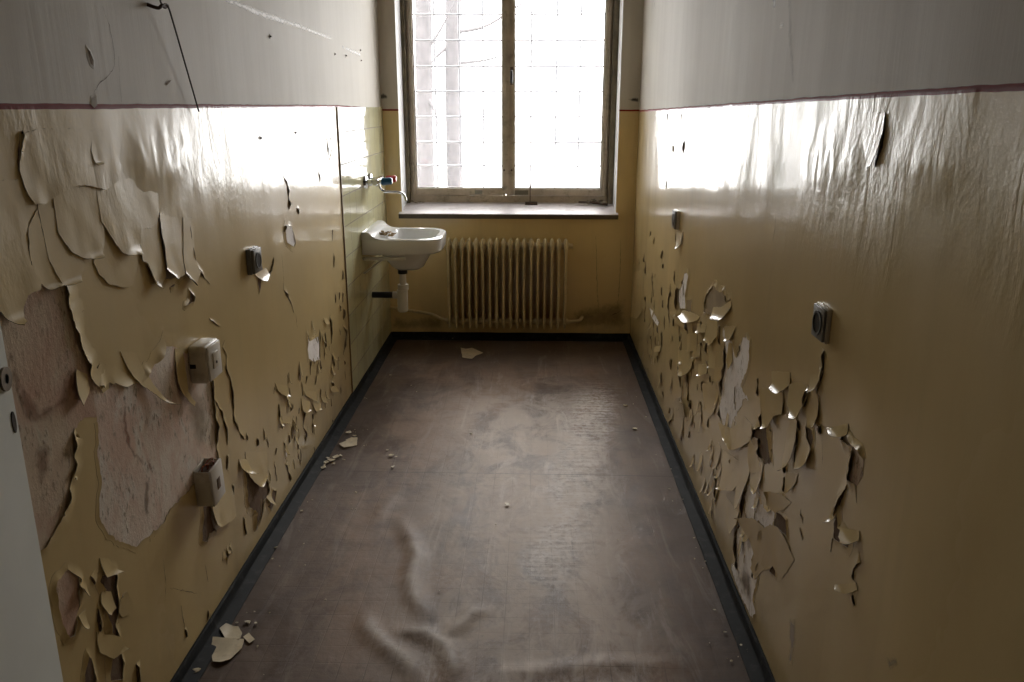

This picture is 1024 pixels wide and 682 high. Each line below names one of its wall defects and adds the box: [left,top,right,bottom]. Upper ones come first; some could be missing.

peeling [863,112,886,168]
peeling [0,128,348,564]
peeling [339,437,358,447]
peeling [629,231,866,622]
peeling [49,558,141,682]